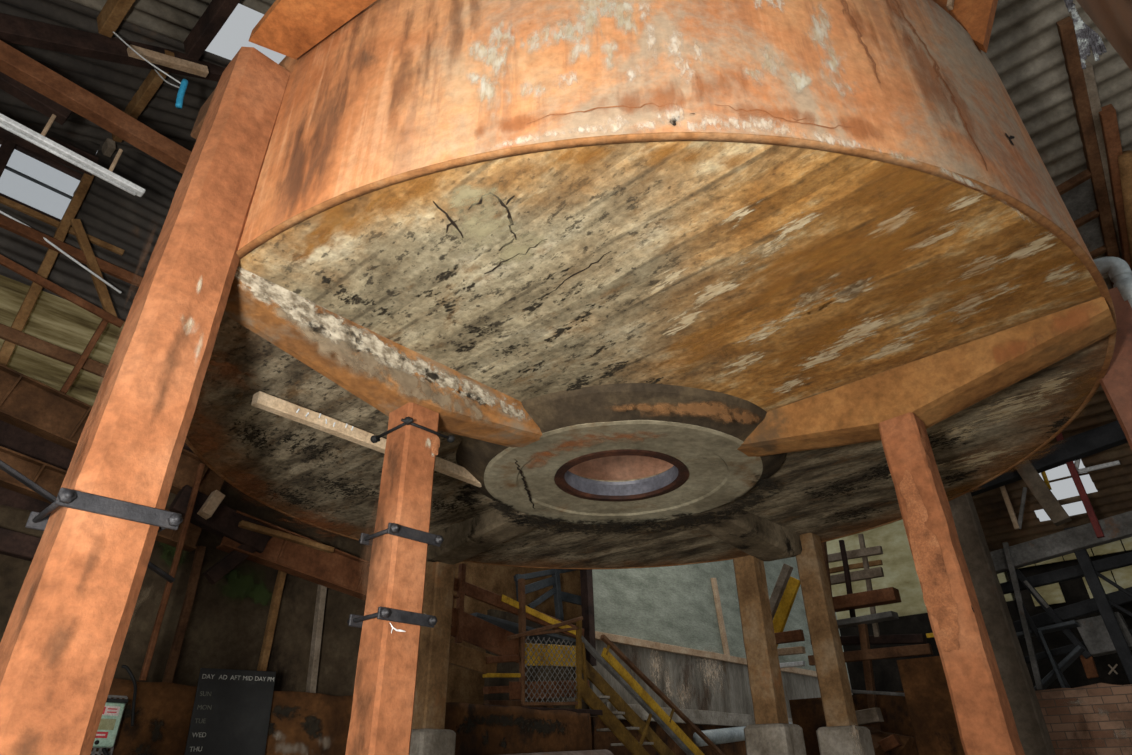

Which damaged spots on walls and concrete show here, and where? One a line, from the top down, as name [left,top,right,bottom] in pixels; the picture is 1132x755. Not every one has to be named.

crack [840,0,881,83]
crack [895,0,988,171]
crack [527,103,673,124]
crack [433,192,547,274]
water stain [322,276,394,318]
water stain [417,265,475,312]
water stain [522,266,582,314]
peeling [235,266,526,420]
water stain [276,308,488,422]
water stain [544,304,602,342]
rust [616,402,759,424]
crack [515,460,535,509]